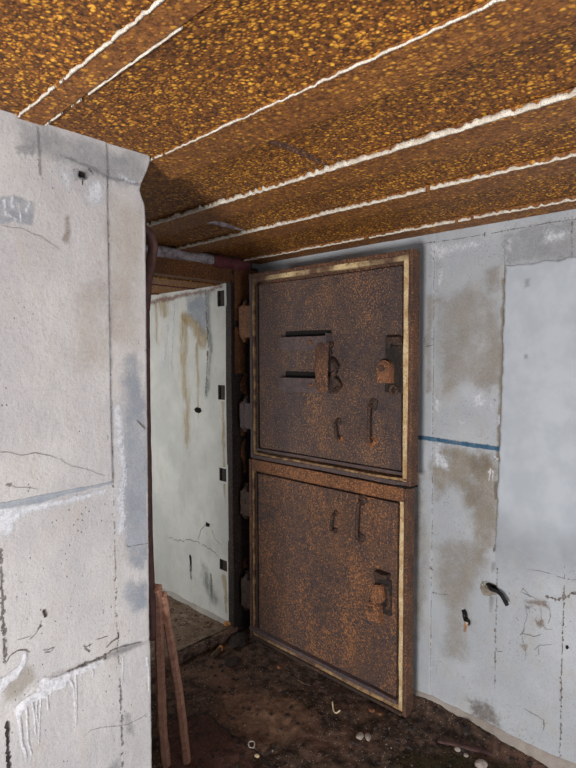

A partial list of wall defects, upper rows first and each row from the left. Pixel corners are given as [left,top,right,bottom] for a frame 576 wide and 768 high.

crack [0,452,103,476]
damp [432,442,499,545]
crack [516,570,576,656]
damp [0,652,27,694]
damp [15,658,104,761]